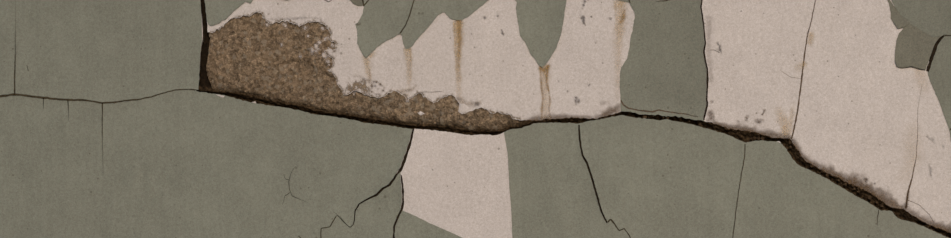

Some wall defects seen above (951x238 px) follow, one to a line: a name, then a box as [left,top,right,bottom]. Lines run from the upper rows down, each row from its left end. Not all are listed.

crack [0,54,204,138]
peeling [199,0,635,238]
crack [198,0,951,238]
peeling [700,0,951,233]